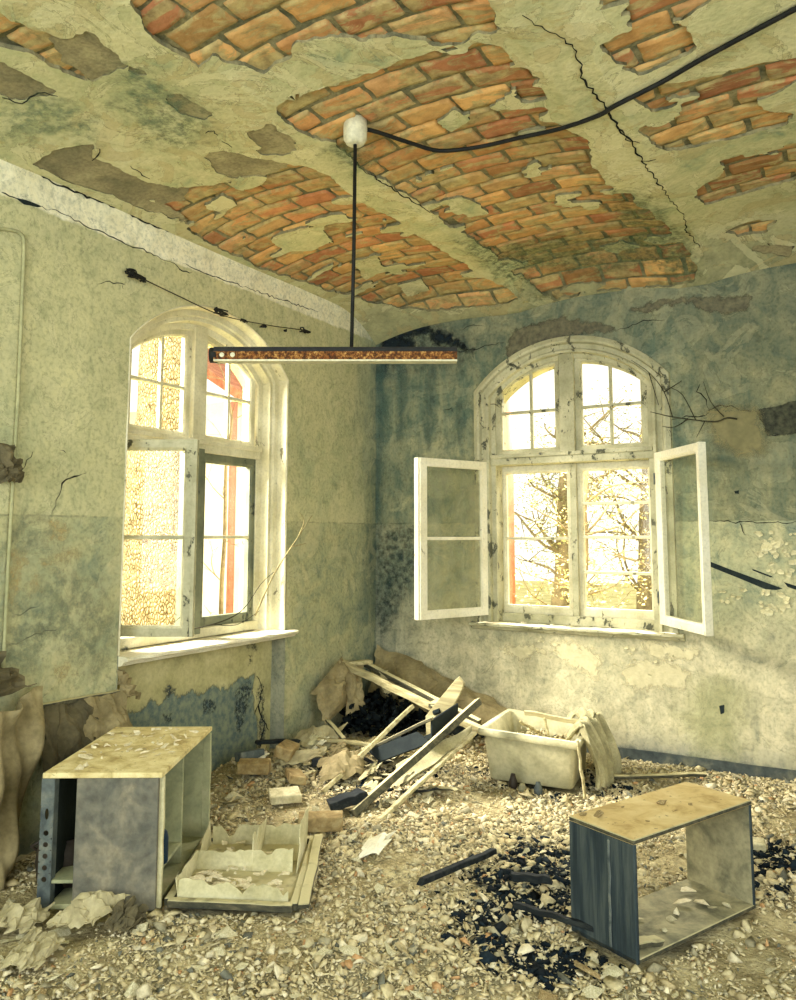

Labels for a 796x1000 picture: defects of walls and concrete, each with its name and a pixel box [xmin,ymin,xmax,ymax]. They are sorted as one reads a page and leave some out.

flaking render [0,13,146,80]
flaking render [33,0,707,310]
crack [522,15,700,247]
flaking render [636,58,796,148]
flaking render [696,143,796,203]
crack [42,176,318,312]
flaking render [506,316,615,357]
flaking render [757,401,796,436]
crack [52,450,85,512]
damp [376,525,414,629]
peeling [711,530,796,616]
peeling [128,643,266,772]